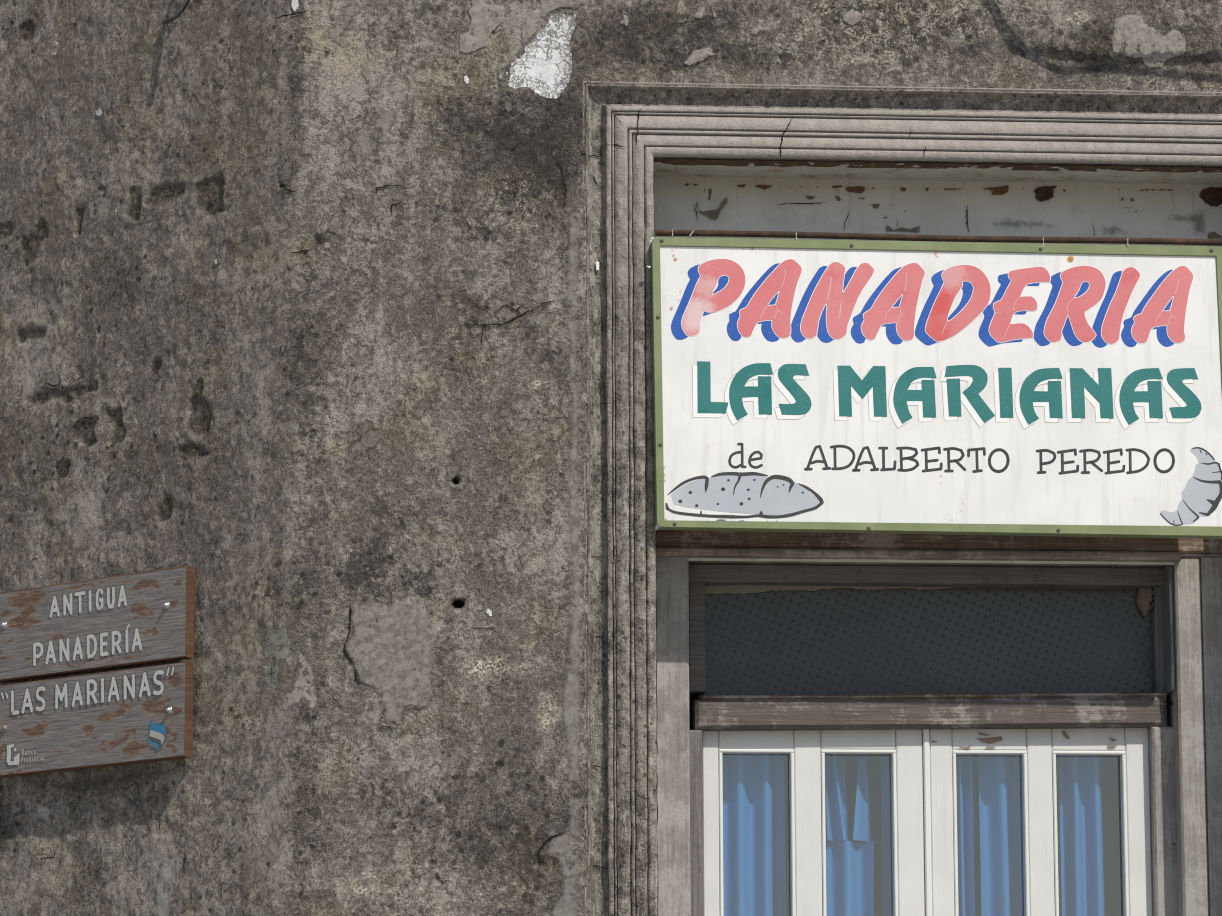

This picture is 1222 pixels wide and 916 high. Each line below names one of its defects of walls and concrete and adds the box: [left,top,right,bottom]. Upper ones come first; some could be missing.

peeling [459,0,506,53]
peeling [499,0,586,99]
peeling [1112,14,1186,68]
flaking render [654,159,1222,207]
peeling [696,197,728,220]
peeling [859,197,920,233]
crack [461,300,555,350]